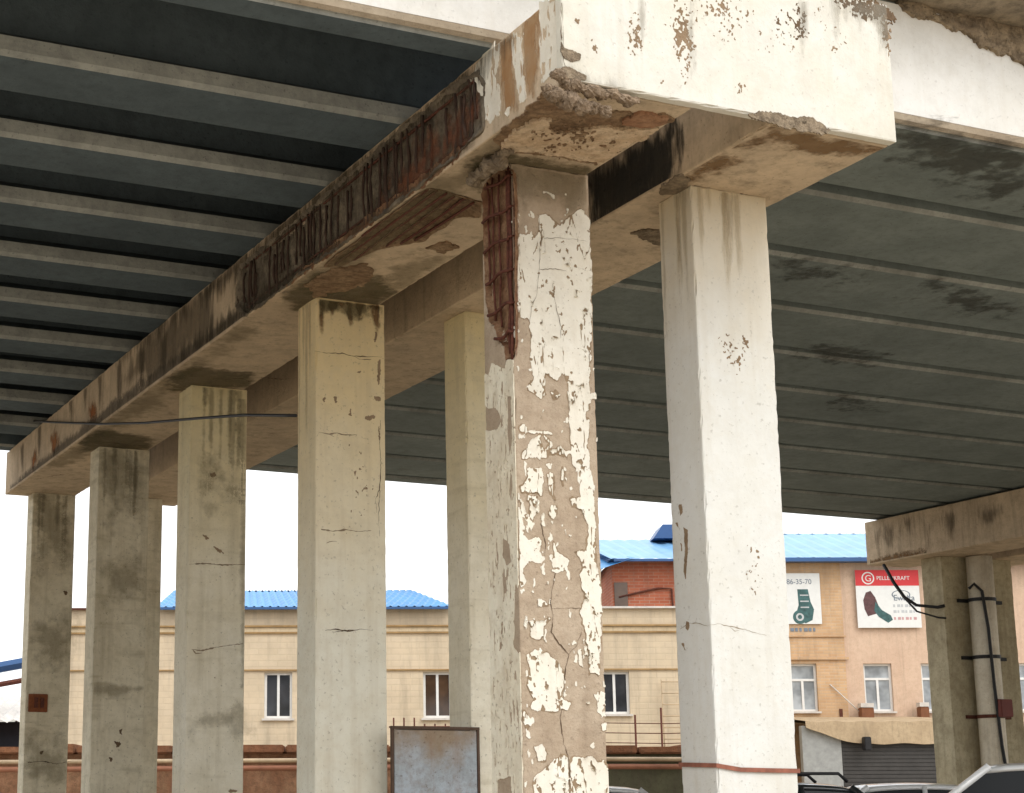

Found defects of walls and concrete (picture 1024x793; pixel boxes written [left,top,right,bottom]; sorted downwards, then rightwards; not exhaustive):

peeling [665,0,754,84]
spalling [758,0,1024,66]
water stain [508,118,683,222]
spalling [659,173,691,195]
water stain [284,275,397,330]
water stain [171,366,252,391]
peeling [235,0,675,793]
water stain [80,431,150,451]
crack [321,420,381,543]
crack [192,643,243,654]
crack [541,525,582,786]